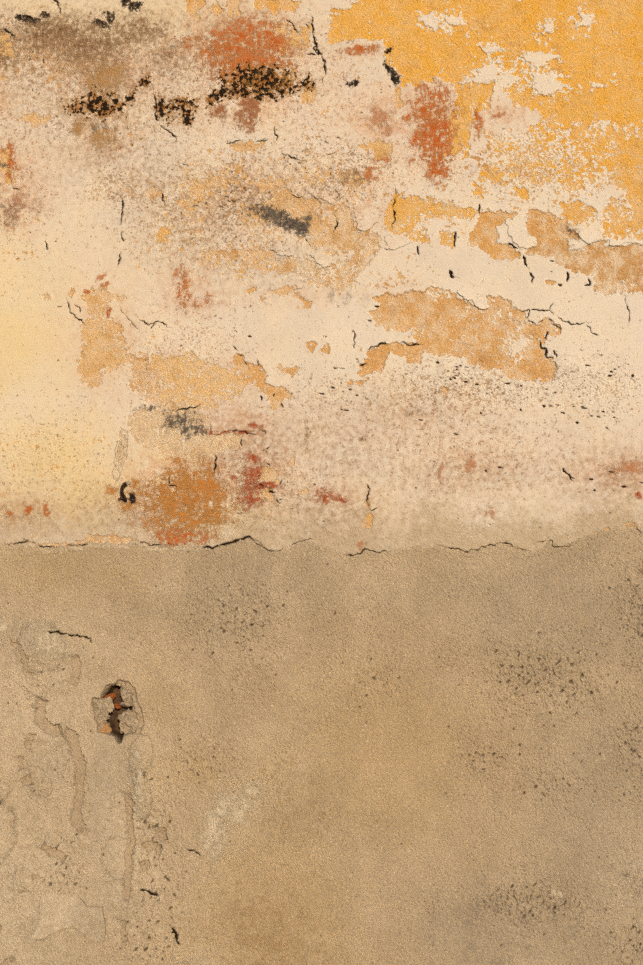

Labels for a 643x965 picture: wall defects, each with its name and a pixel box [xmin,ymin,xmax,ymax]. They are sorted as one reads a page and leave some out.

peeling [185,0,243,21]
leakage [154,61,315,128]
corrosion [182,13,302,134]
corrosion [362,153,390,185]
peeling [201,0,643,309]
corrosion [402,81,458,185]
peeling [67,287,302,482]
peeling [347,285,615,429]
corrosion [106,453,282,547]
crack [204,536,311,551]
crack [441,540,569,553]
crack [48,631,91,642]